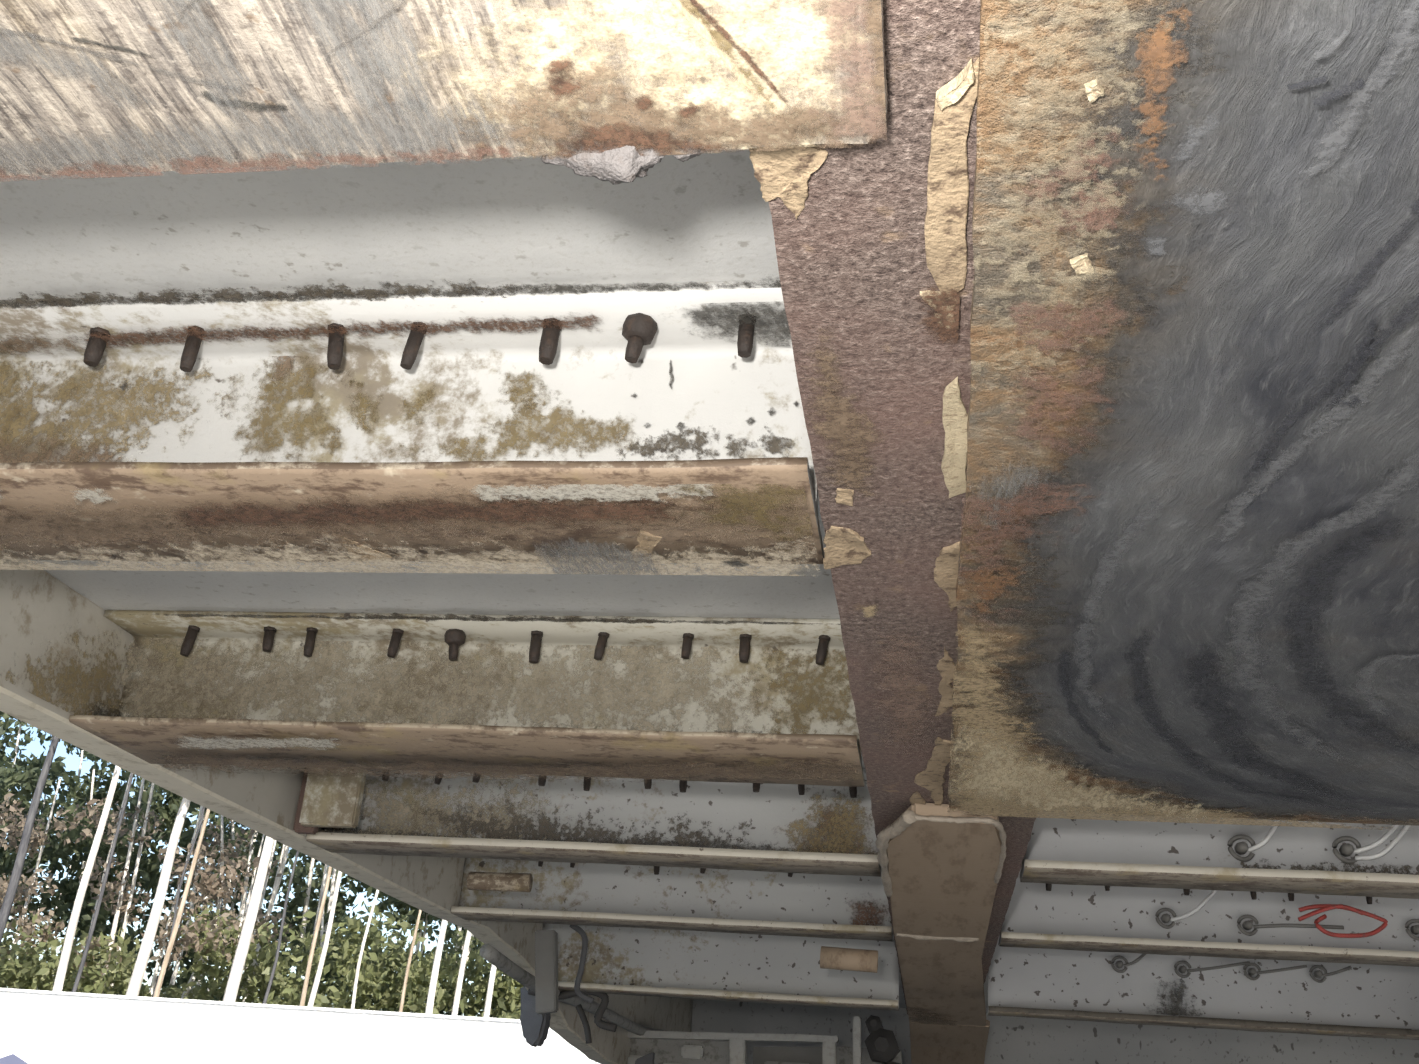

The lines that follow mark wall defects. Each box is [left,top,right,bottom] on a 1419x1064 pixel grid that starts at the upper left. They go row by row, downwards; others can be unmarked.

rust [1136,10,1191,168]
water stain [1305,0,1419,176]
peeling [920,58,979,343]
rust [1024,131,1120,231]
water stain [619,410,794,460]
peeling [941,376,968,498]
rust [1009,358,1114,455]
water stain [1219,293,1419,541]
peeling [934,541,960,612]
rust [958,483,1092,631]
water stain [1058,498,1162,754]
water stain [1124,455,1419,813]